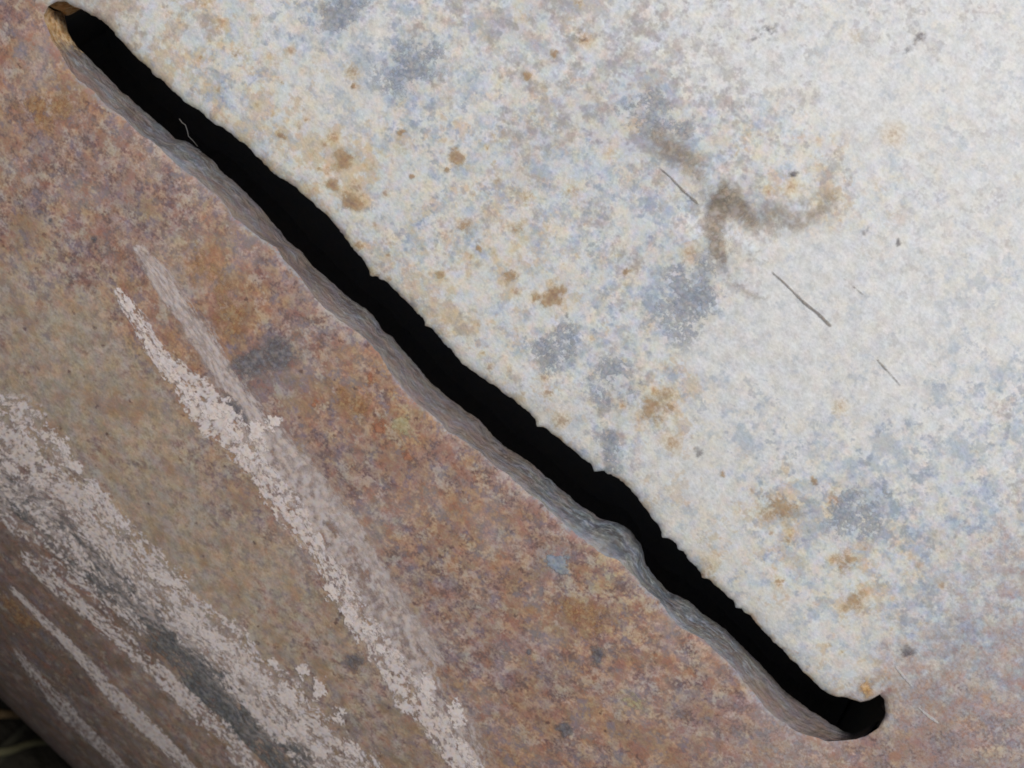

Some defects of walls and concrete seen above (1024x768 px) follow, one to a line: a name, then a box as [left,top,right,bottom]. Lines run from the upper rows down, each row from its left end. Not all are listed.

rust [326,149,364,211]
rust [445,148,465,172]
rust [532,286,567,307]
peeling [116,287,283,463]
crack [44,1,886,741]
rust [643,393,673,421]
peeling [322,581,404,659]
peeling [136,567,331,761]
peeling [328,706,347,726]
peeling [420,669,478,768]
peeling [343,740,361,761]